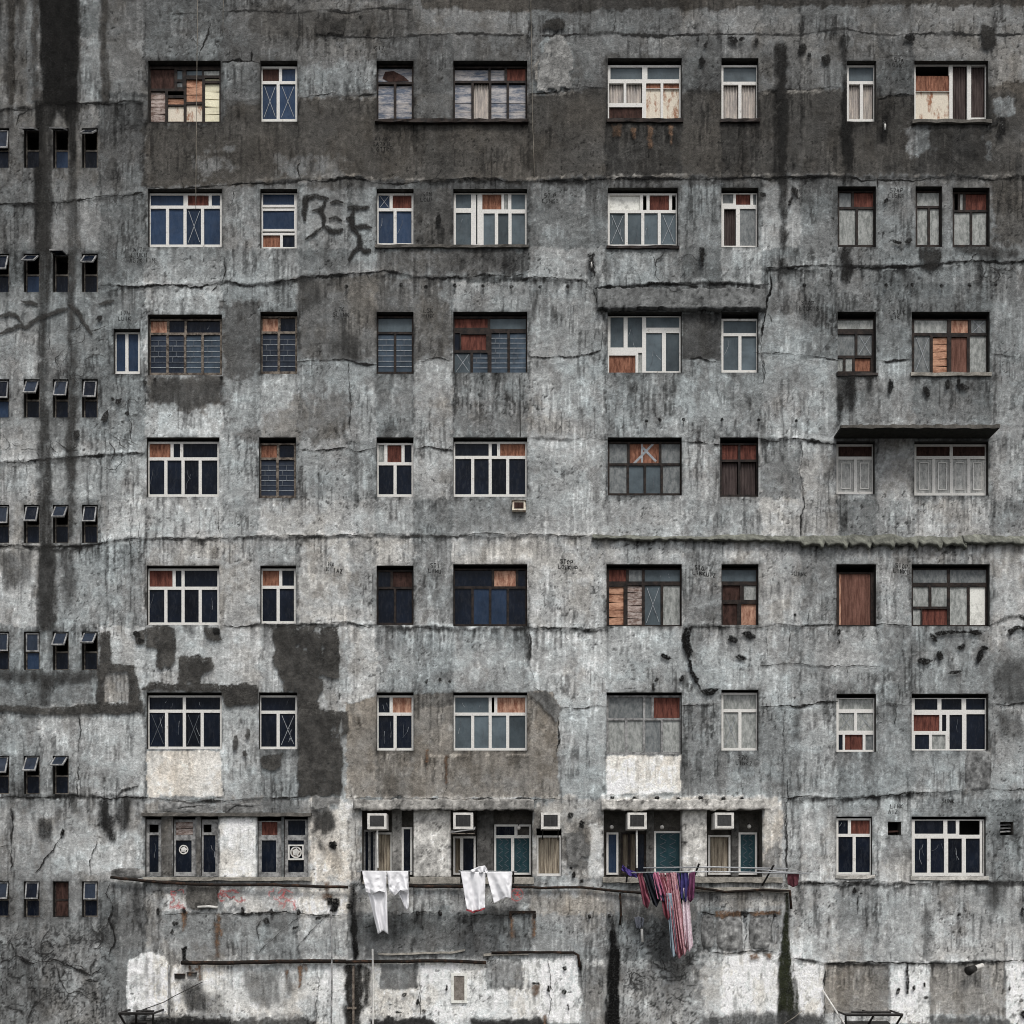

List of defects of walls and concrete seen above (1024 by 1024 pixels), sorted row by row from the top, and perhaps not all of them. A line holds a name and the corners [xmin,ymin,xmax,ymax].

leakage [0,0,80,631]
leakage [99,0,111,102]
crack [0,115,1024,388]
leakage [773,43,791,264]
leakage [703,877,826,1024]